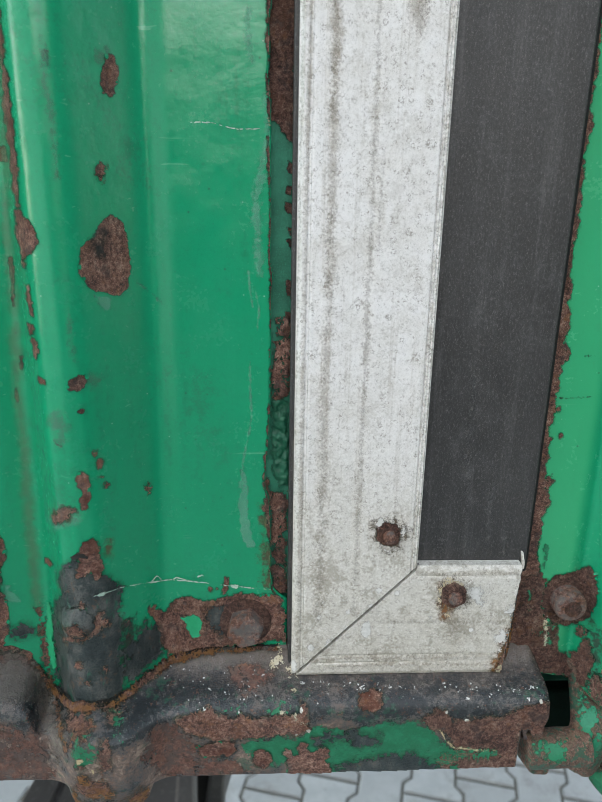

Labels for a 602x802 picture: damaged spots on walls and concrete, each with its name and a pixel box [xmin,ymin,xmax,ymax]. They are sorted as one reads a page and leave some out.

corrosion [265,0,294,142]
corrosion [0,11,39,306]
corrosion [95,161,107,181]
corrosion [490,24,602,707]
corrosion [0,214,290,781]
corrosion [370,518,411,557]
corrosion [437,578,455,620]
corrosion [71,737,150,802]
corrosion [140,700,332,777]
corrosion [357,688,384,713]
corrosion [422,699,550,769]